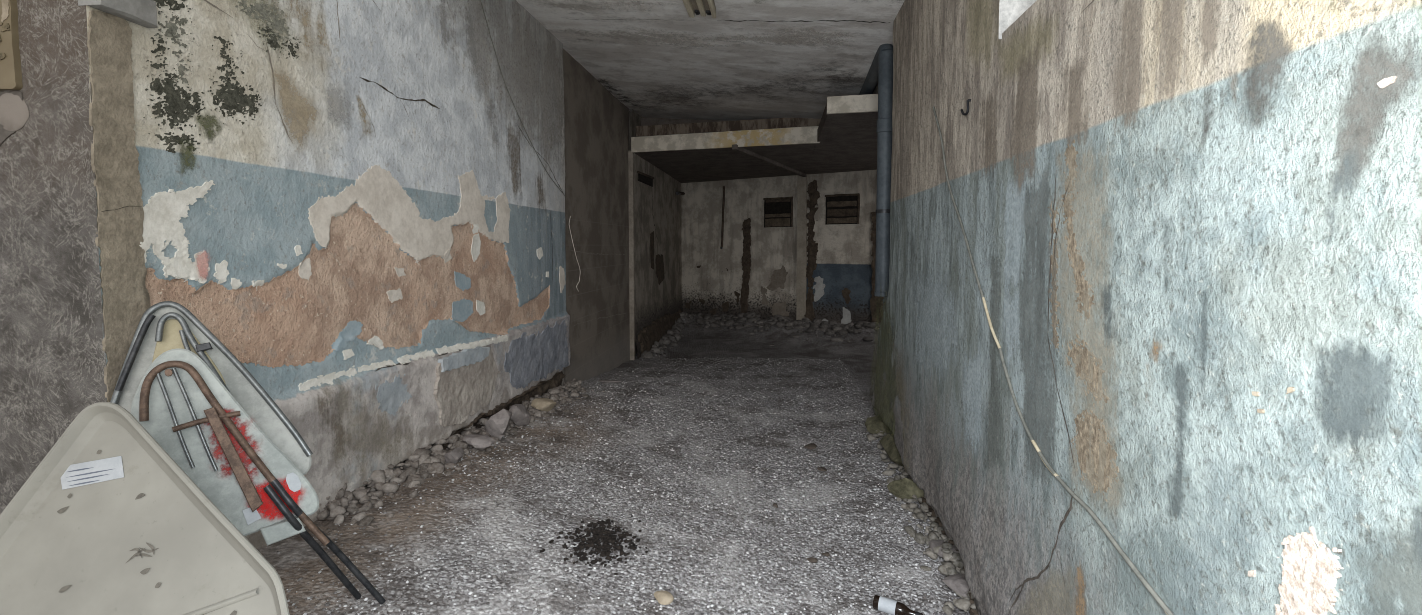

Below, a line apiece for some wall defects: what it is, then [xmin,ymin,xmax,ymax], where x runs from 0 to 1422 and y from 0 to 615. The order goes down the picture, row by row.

damp [143,0,262,173]
damp [235,0,370,145]
crack [360,77,440,137]
damp [1232,23,1290,120]
damp [1335,46,1414,193]
spalling [87,10,566,402]
damp [1319,347,1391,442]
crack [1008,489,1075,615]
spalling [1274,527,1344,615]